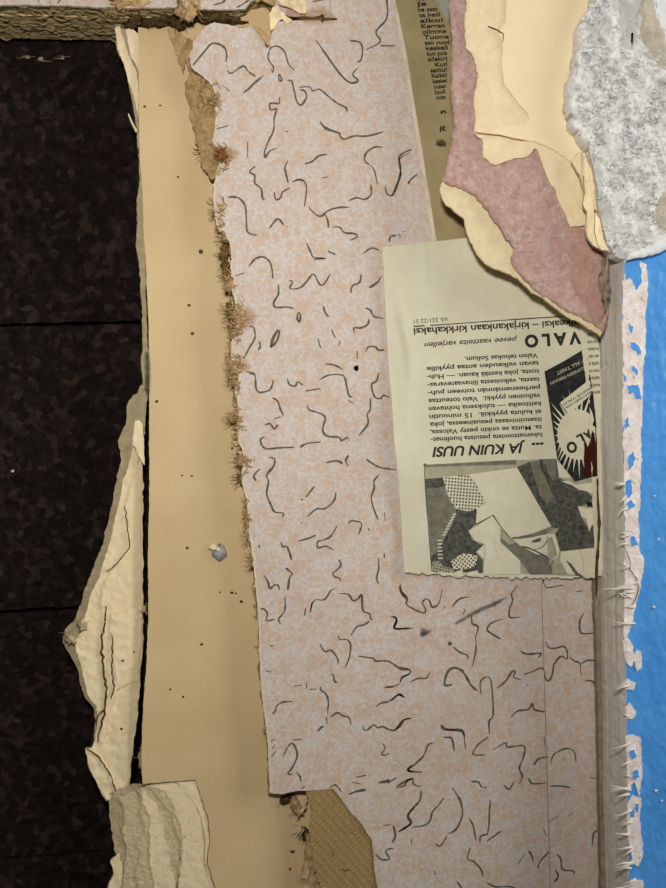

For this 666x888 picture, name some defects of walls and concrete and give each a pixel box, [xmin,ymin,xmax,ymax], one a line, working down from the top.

peeling [656,0,666,41]
peeling [439,0,611,337]
peeling [60,26,214,888]
peeling [600,261,648,671]
peeling [612,679,636,691]
peeling [623,702,636,719]
peeling [609,734,644,888]